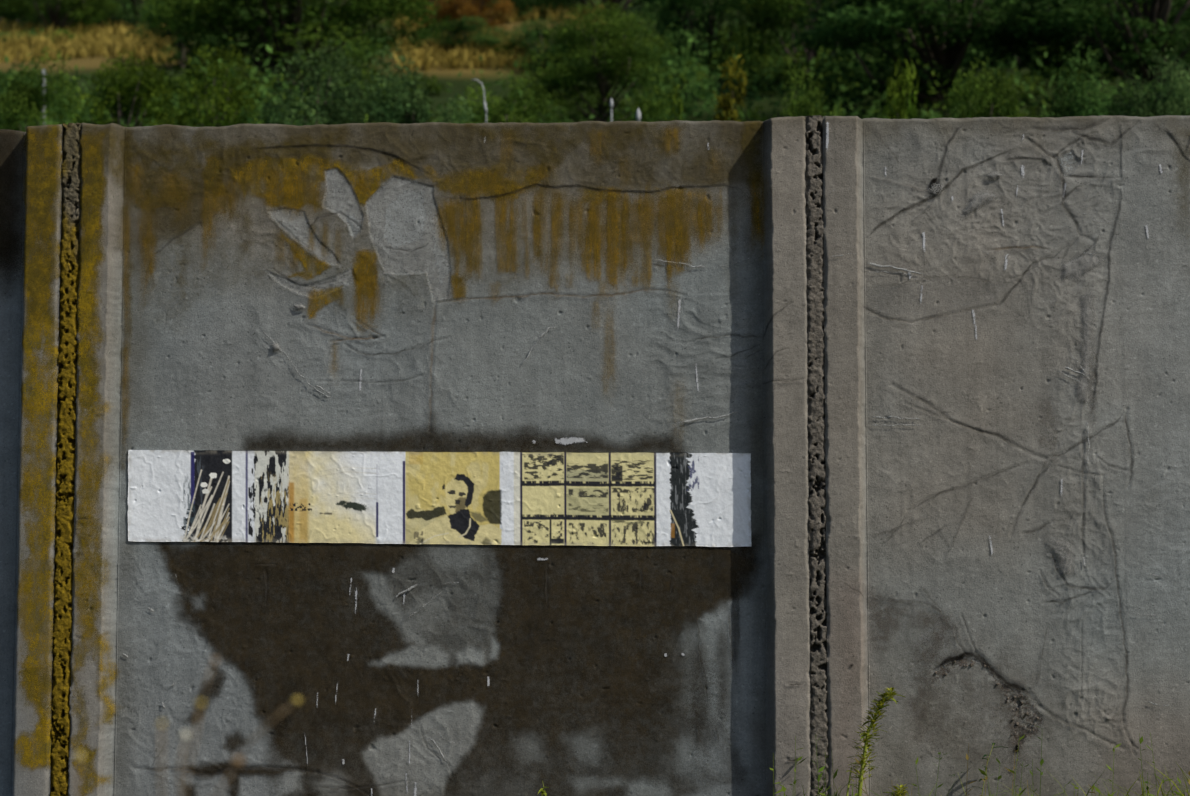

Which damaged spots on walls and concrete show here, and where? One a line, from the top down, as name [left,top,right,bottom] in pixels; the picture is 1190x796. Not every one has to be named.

crack [878,159,989,226]
crack [1042,124,1124,208]
crack [1061,525,1129,704]
leakage [159,537,758,796]
crack [939,652,1029,695]